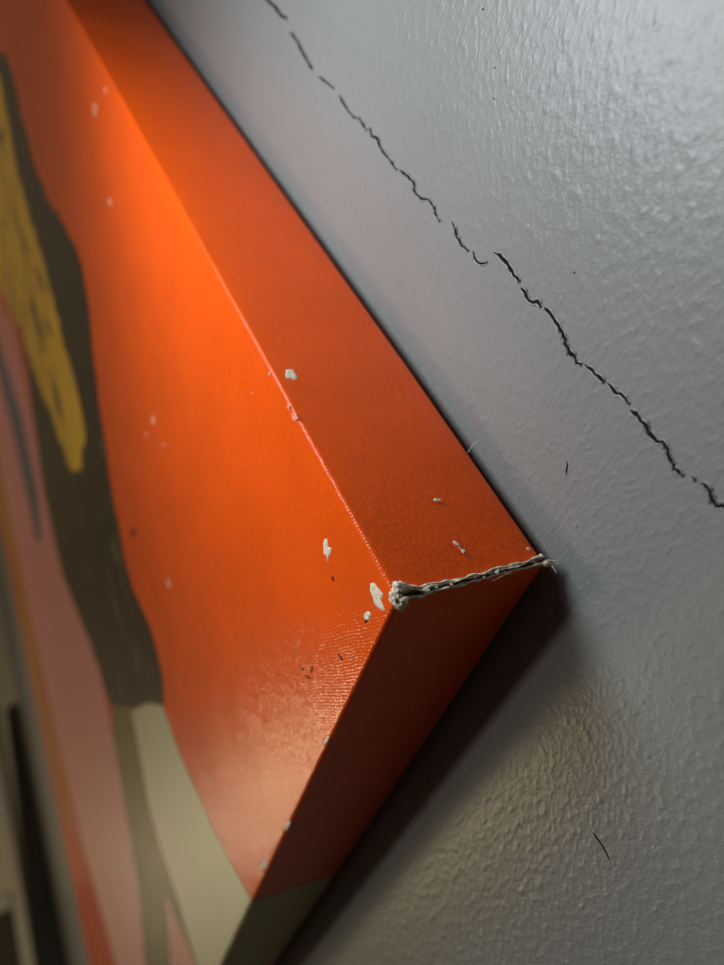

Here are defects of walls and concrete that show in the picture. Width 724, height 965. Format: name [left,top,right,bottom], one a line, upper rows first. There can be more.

crack [263,0,724,512]